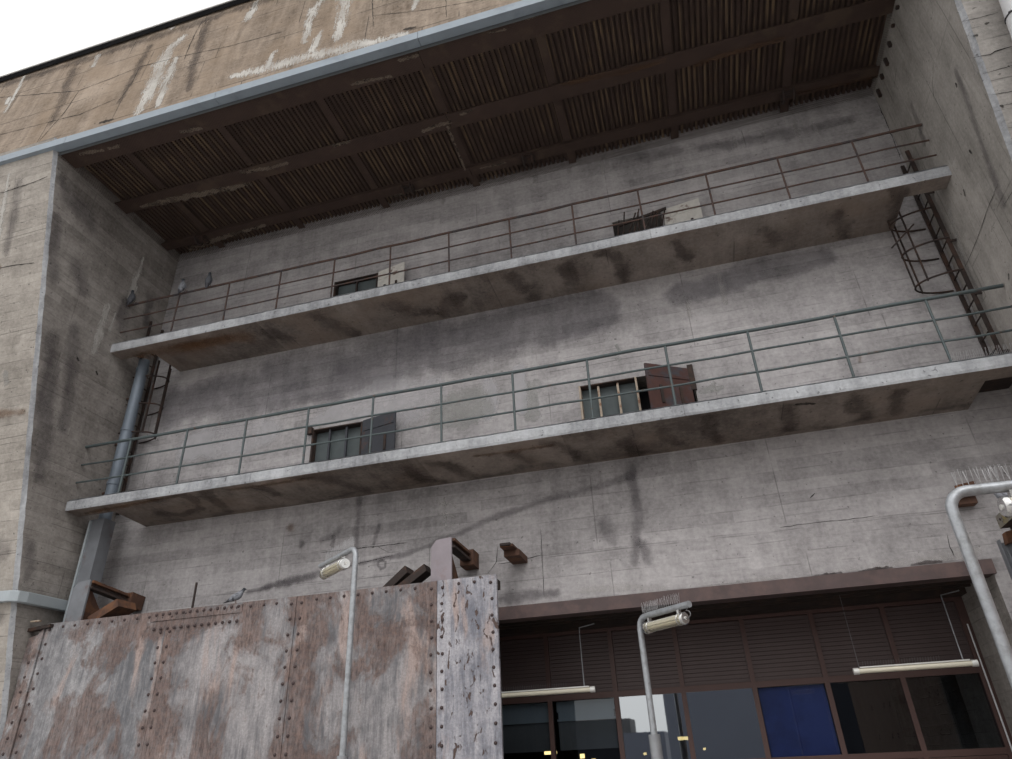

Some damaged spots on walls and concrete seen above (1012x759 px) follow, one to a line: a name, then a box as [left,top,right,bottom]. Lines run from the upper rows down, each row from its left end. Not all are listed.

damp [134,26,186,116]
damp [230,0,409,78]